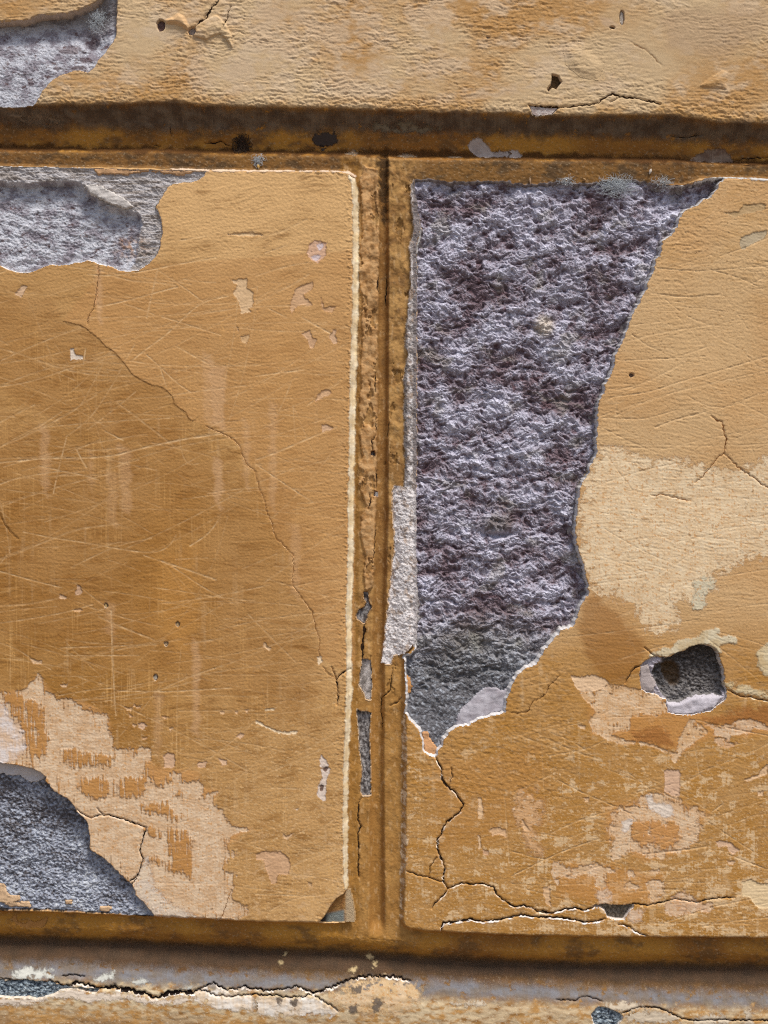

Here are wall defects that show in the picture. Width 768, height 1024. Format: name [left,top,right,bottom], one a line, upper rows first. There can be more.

spalling [0,0,118,108]
crack [532,93,659,109]
spalling [0,166,206,297]
spalling [356,178,768,797]
crack [652,419,766,501]
crack [208,428,367,701]
peeling [0,658,249,920]
crack [410,758,733,936]
crack [48,974,410,1006]
crack [623,1006,768,1021]